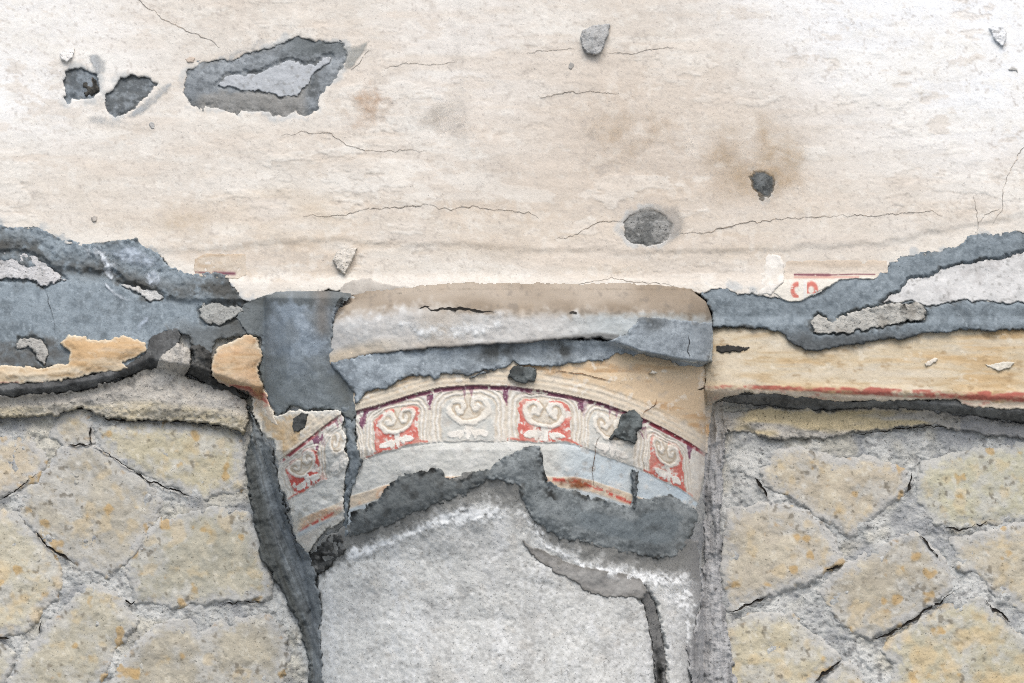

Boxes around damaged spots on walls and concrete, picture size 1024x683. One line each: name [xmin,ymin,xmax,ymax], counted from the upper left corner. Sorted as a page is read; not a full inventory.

flaking render [0,252,66,287]
flaking render [118,281,164,302]
flaking render [757,254,785,296]
flaking render [810,252,1024,334]
flaking render [199,302,243,326]
flaking render [16,338,49,365]
spalling [310,534,345,574]